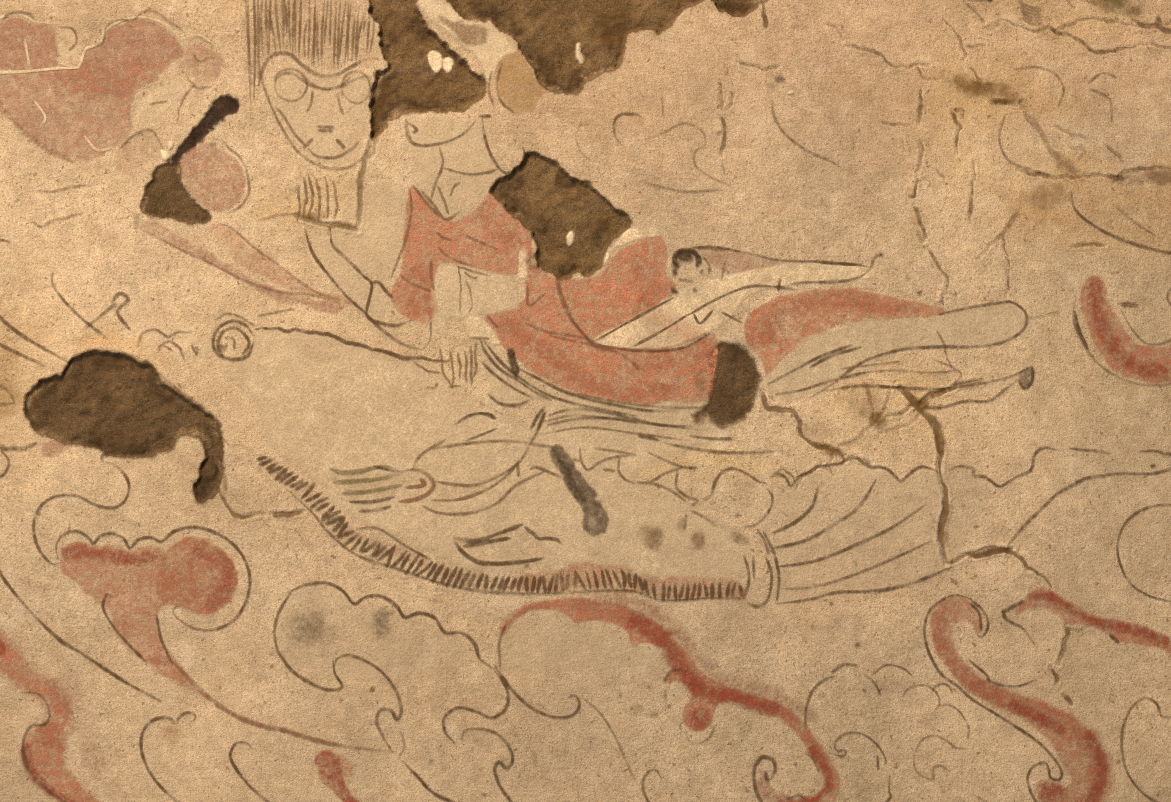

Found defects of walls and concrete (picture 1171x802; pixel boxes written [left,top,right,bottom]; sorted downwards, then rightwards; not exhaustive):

spalling [371,61,394,99]
peeling [413,51,453,81]
spalling [527,43,616,93]
crack [1006,0,1171,54]
spalling [161,95,239,173]
crack [853,46,955,302]
crack [952,109,975,218]
crack [1026,124,1162,181]
crack [997,214,1018,292]
crack [761,393,844,486]
crack [869,381,1052,588]